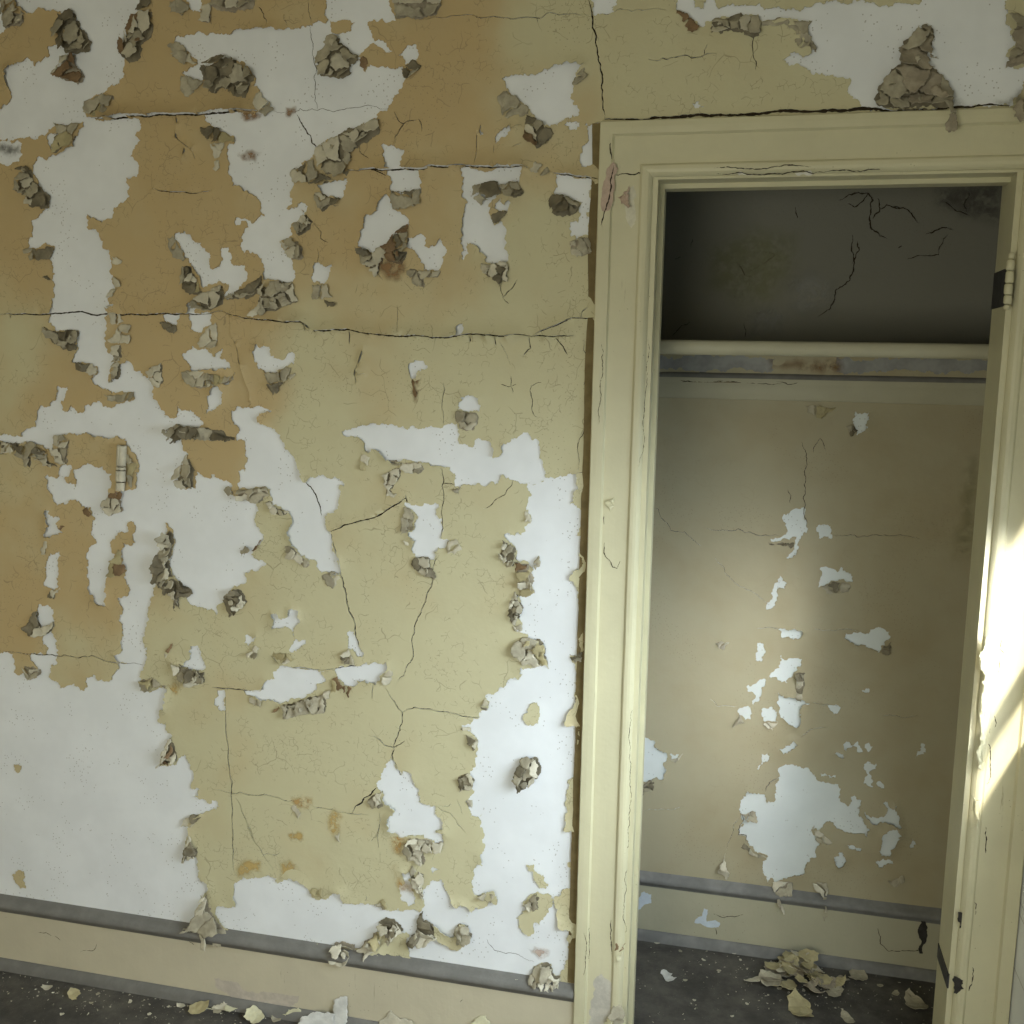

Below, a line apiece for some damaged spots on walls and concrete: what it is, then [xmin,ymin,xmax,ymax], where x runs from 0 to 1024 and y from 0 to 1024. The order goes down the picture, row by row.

crack [349,153,519,176]
peeling [461,62,637,286]
crack [556,1,1010,224]
crack [716,164,970,316]
peeling [676,0,1024,133]
crack [8,310,604,473]
peeling [0,0,582,992]
crack [306,483,407,550]
crack [401,473,452,677]
peeling [769,507,832,558]
peeling [732,656,809,730]
peeling [739,741,900,915]